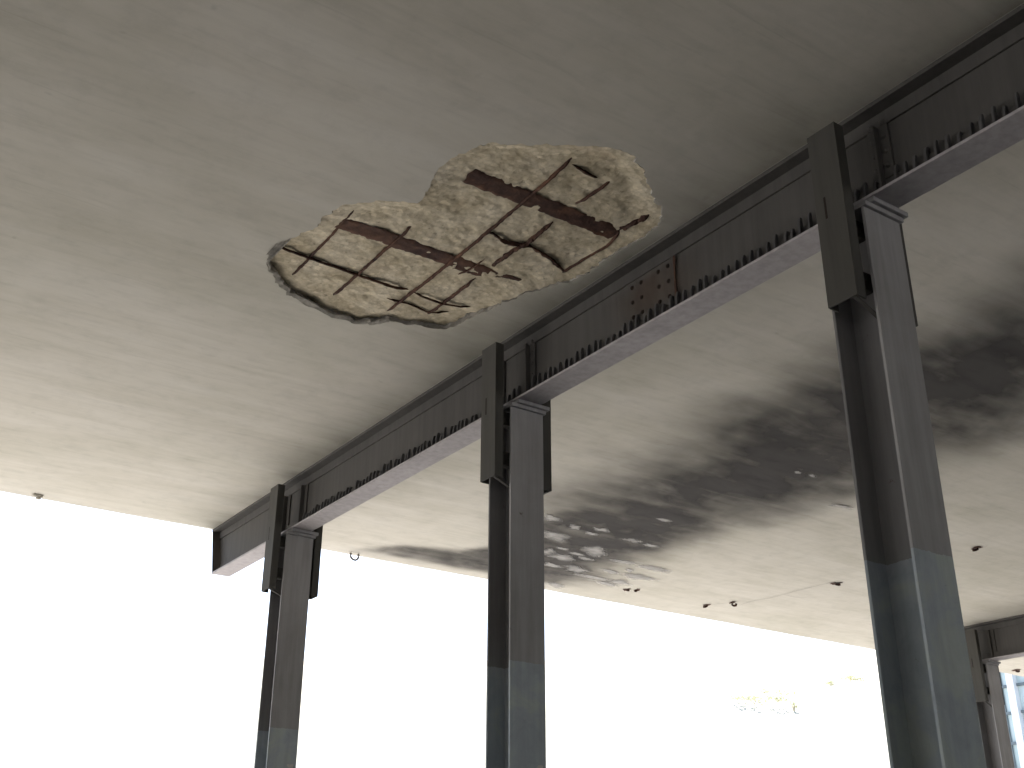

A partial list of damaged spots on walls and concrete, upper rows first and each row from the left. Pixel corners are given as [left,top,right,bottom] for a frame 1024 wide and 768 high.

spalling [266,142,662,329]